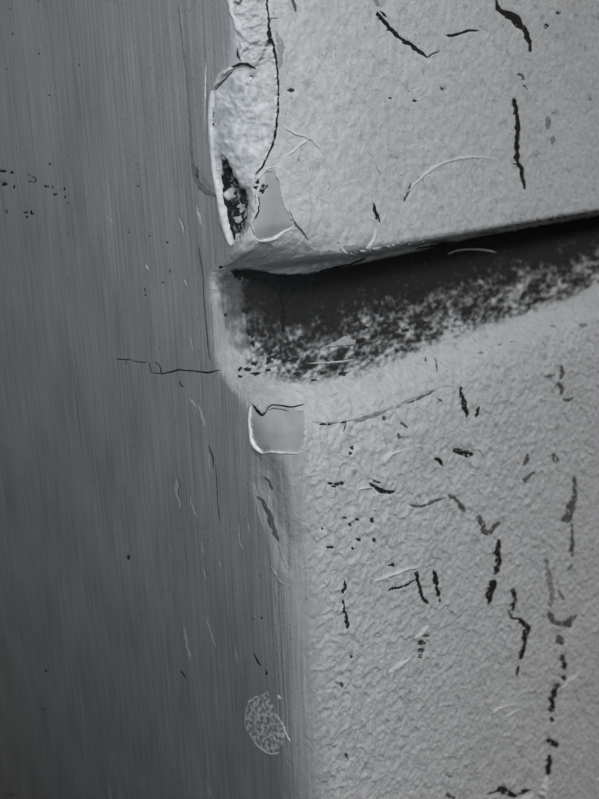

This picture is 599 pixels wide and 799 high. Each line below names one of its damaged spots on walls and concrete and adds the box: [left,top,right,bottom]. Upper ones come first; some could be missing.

crack [374,0,479,58]
crack [495,0,532,52]
spalling [207,0,308,246]
crack [512,73,528,190]
crack [546,365,575,402]
spalling [248,384,459,571]
crack [369,479,396,494]
crack [434,448,474,466]
crack [388,569,441,604]
crack [411,494,531,677]
crack [543,476,578,775]
crack [487,786,531,798]